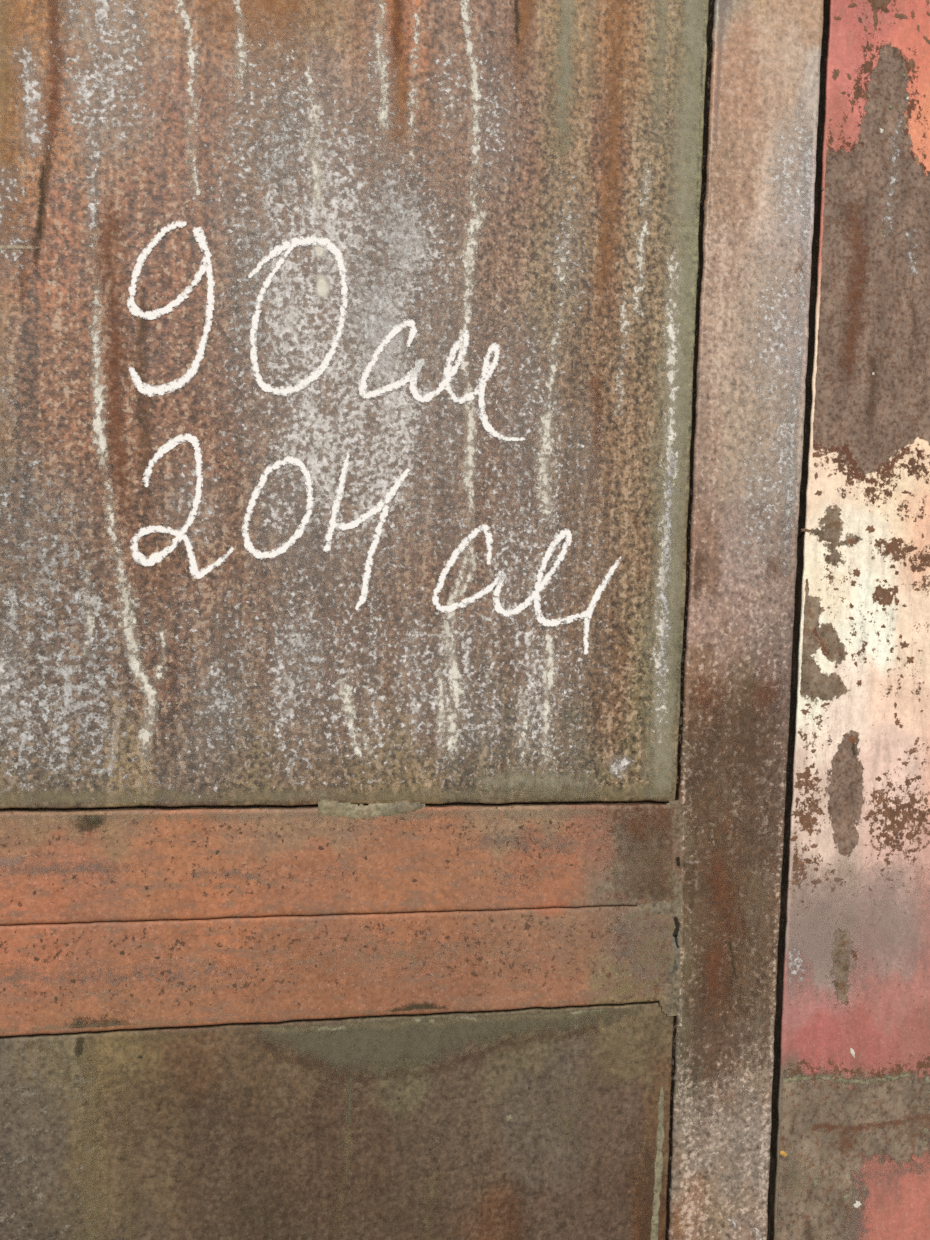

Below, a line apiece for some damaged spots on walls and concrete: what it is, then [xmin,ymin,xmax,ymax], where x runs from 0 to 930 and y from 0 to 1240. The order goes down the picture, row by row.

corrosion [46,0,61,140]
corrosion [393,0,405,133]
peeling [833,0,930,44]
corrosion [20,155,50,262]
corrosion [106,301,150,492]
peeling [790,472,930,926]